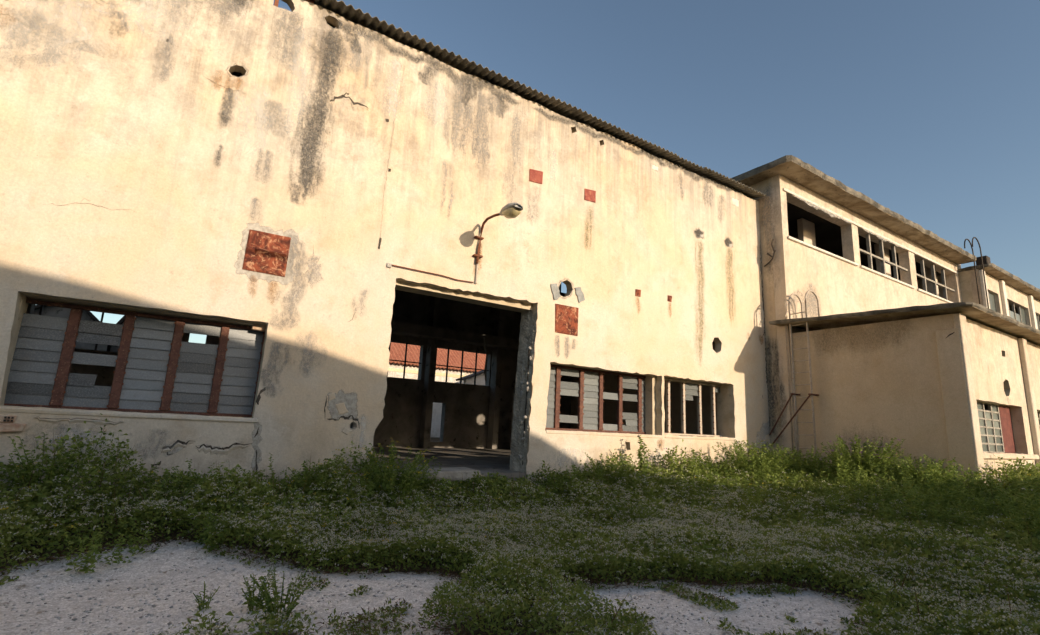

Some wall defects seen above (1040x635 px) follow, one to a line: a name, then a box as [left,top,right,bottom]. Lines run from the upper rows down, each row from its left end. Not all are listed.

leakage [221,88,233,123]
leakage [275,12,361,203]
crack [330,93,368,112]
crack [151,387,266,471]